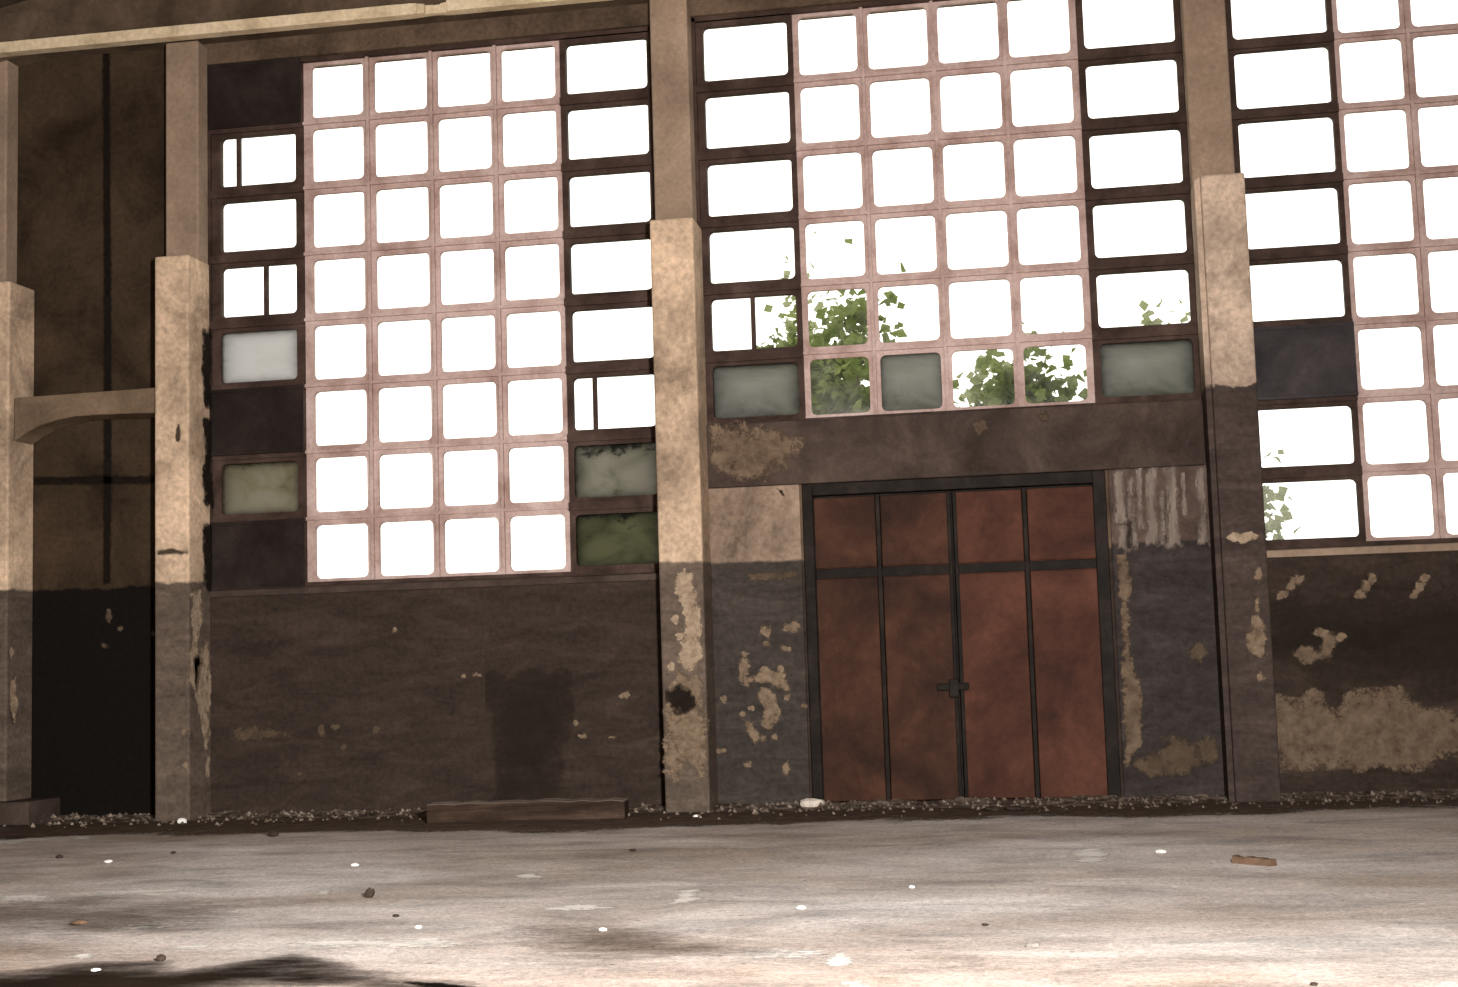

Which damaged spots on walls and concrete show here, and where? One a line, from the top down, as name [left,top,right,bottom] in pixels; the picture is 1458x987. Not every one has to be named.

damp [1114,466,1211,551]
peeling [662,567,808,783]
peeling [1116,554,1219,778]
peeling [1245,567,1458,774]